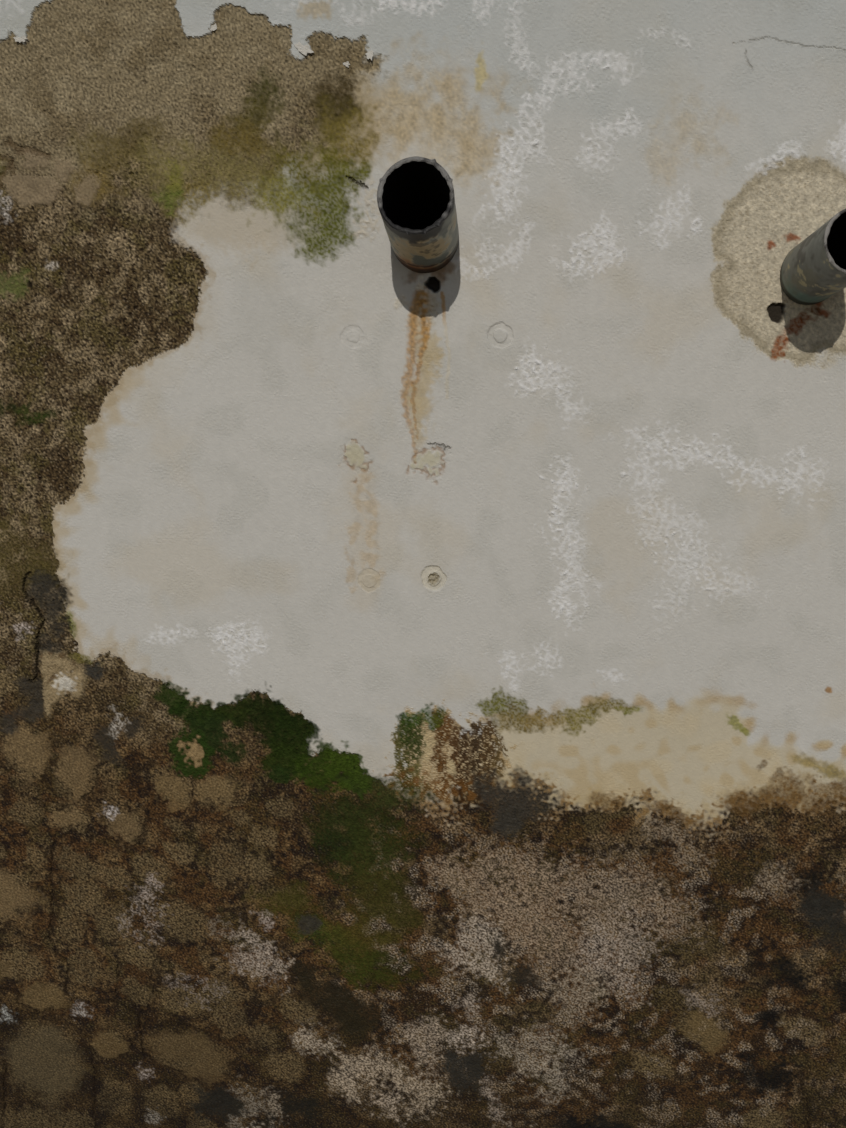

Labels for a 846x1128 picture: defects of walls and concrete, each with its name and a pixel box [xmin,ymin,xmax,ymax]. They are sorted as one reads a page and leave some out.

leakage [274,0,449,28]
peeling [0,0,382,562]
rust [401,261,456,448]
leakage [349,0,692,284]
leakage [545,85,808,284]
peeling [710,157,846,369]
rust [768,233,801,251]
rust [771,301,831,361]
crack [0,768,254,1128]
peeling [0,572,846,1128]
leakage [383,692,846,842]